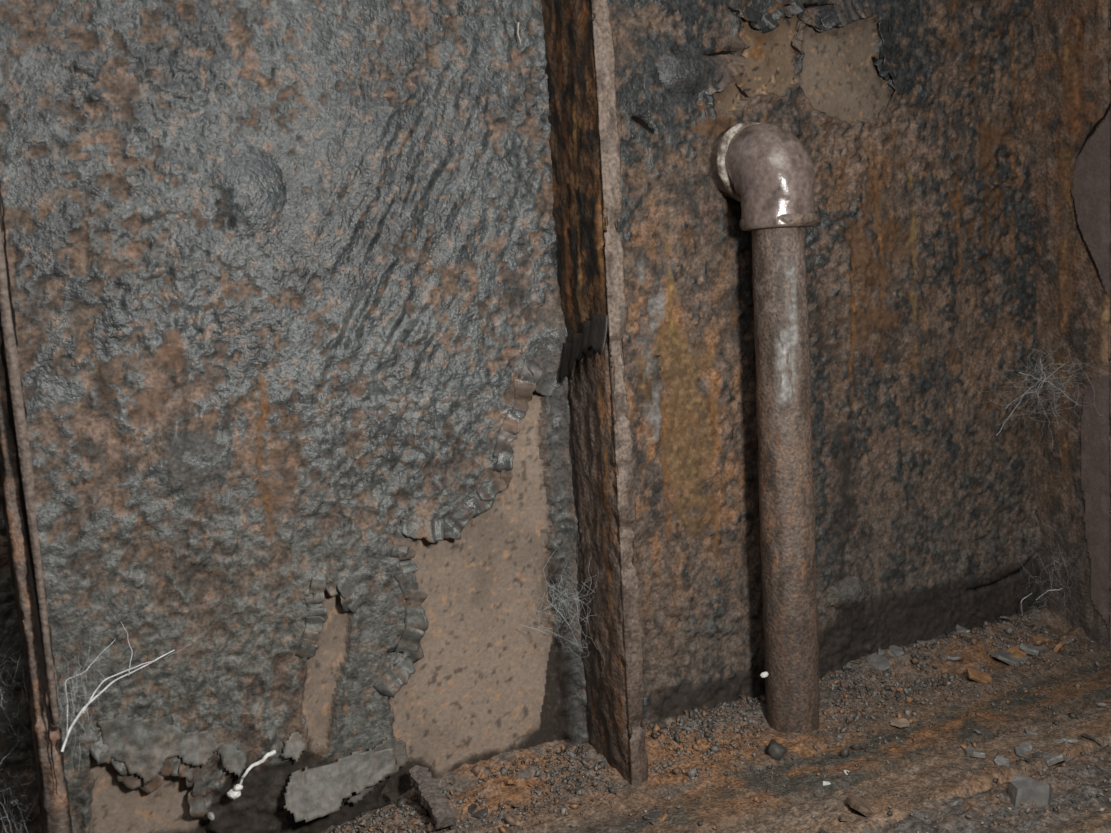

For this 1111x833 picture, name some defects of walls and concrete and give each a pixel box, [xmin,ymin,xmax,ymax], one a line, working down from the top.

corrosion [564,177,582,310]
corrosion [597,189,607,286]
peeling [696,0,905,126]
corrosion [847,161,915,373]
corrosion [1062,10,1096,208]
crack [1070,189,1106,294]
peeling [1071,110,1110,294]
crack [1075,103,1111,159]
corrosion [1101,299,1111,361]
peeling [281,315,632,823]
corrosion [637,320,720,543]
peeling [1081,375,1110,629]